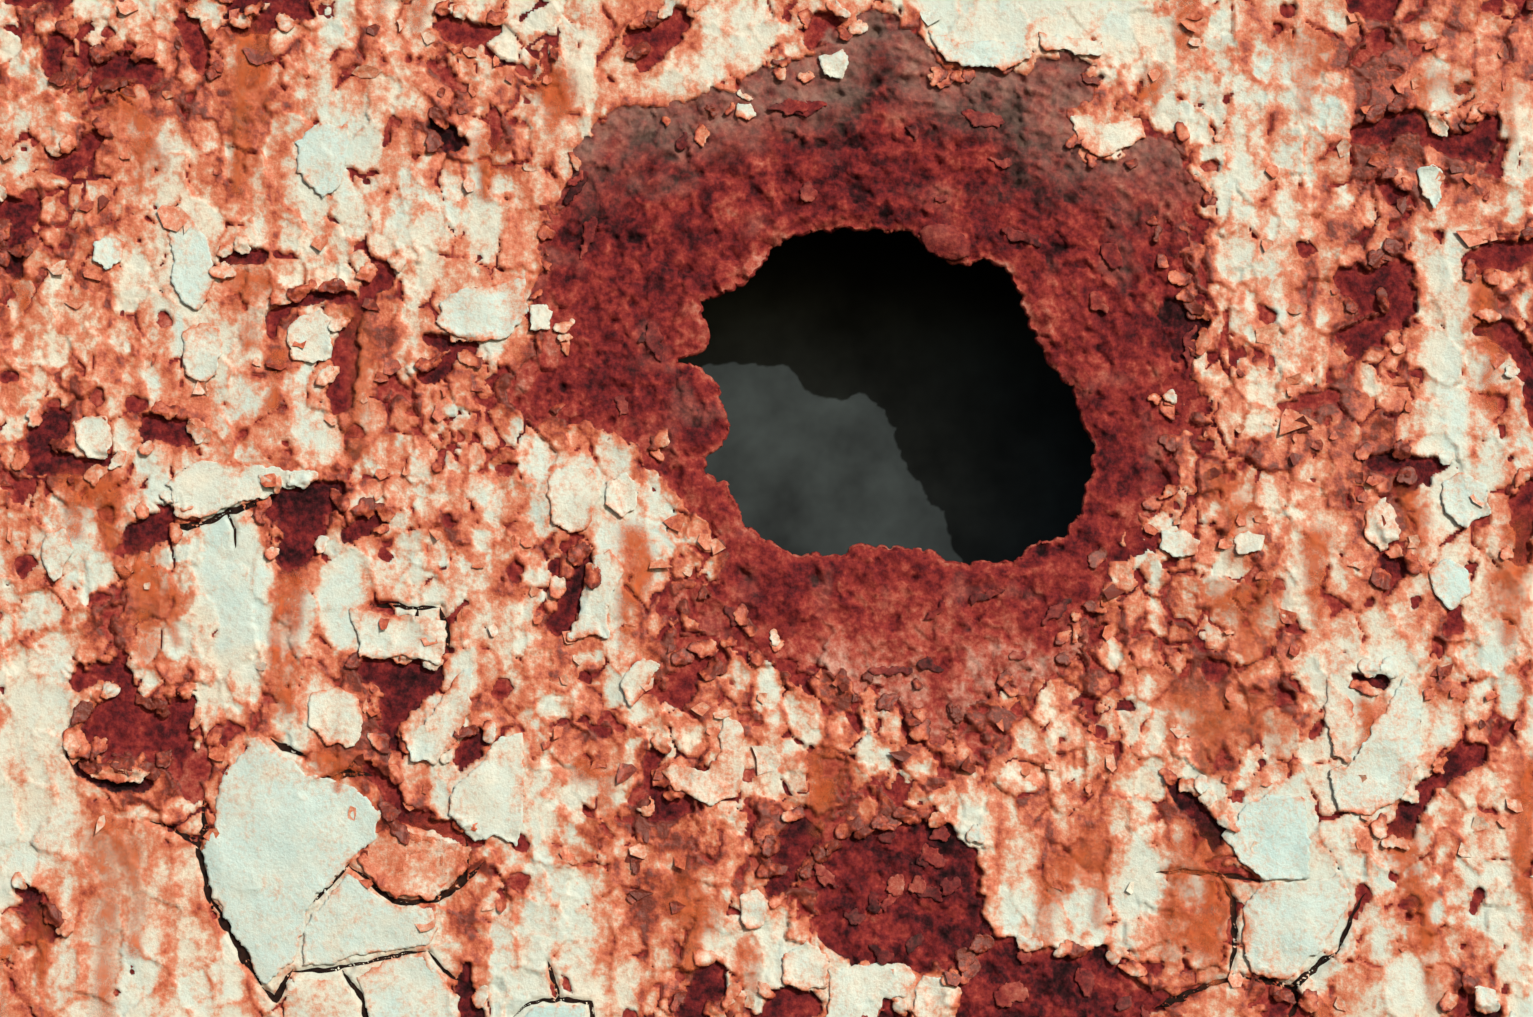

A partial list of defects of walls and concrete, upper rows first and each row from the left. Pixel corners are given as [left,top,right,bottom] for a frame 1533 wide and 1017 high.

rust [383,116,401,146]
rust [515,45,576,130]
rust [157,312,172,329]
peeling [10,205,410,589]
peeling [252,254,575,425]
spalling [678,228,1095,565]
peeling [62,608,563,1017]
crack [270,738,373,780]
crack [150,800,484,1017]
crack [513,962,595,1017]
rust [800,806,1259,1017]
crack [1155,868,1366,1017]